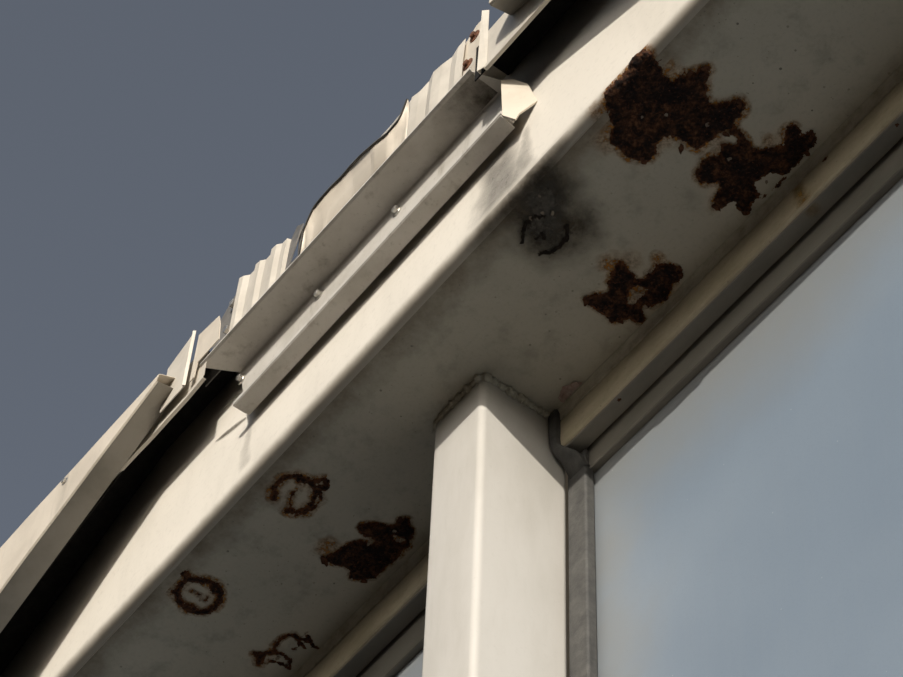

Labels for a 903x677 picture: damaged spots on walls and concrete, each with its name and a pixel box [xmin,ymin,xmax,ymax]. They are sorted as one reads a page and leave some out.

corrosion [595,45,817,216]
corrosion [582,254,683,325]
corrosion [266,472,330,518]
corrosion [317,515,415,583]
corrosion [168,570,226,616]
corrosion [250,632,319,670]